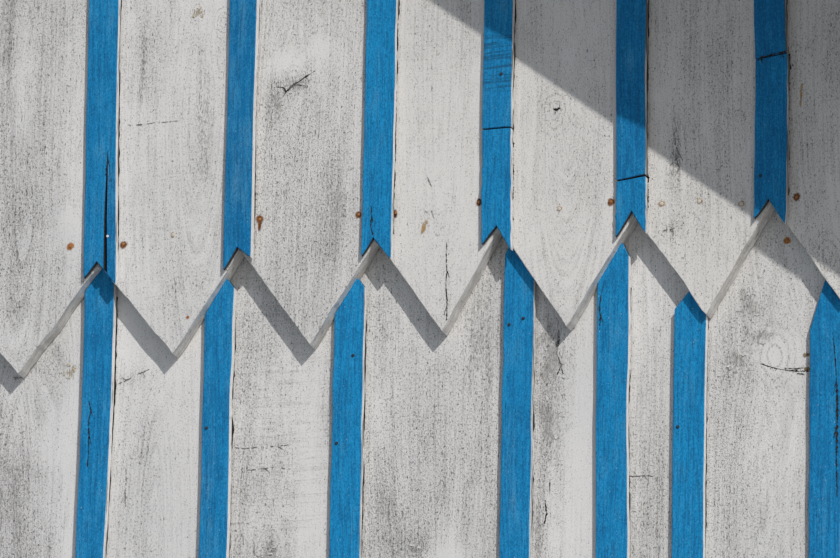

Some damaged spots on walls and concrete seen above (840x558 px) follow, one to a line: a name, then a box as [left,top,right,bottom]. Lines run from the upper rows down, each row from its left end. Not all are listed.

crack [280,71,314,96]
crack [761,363,809,374]